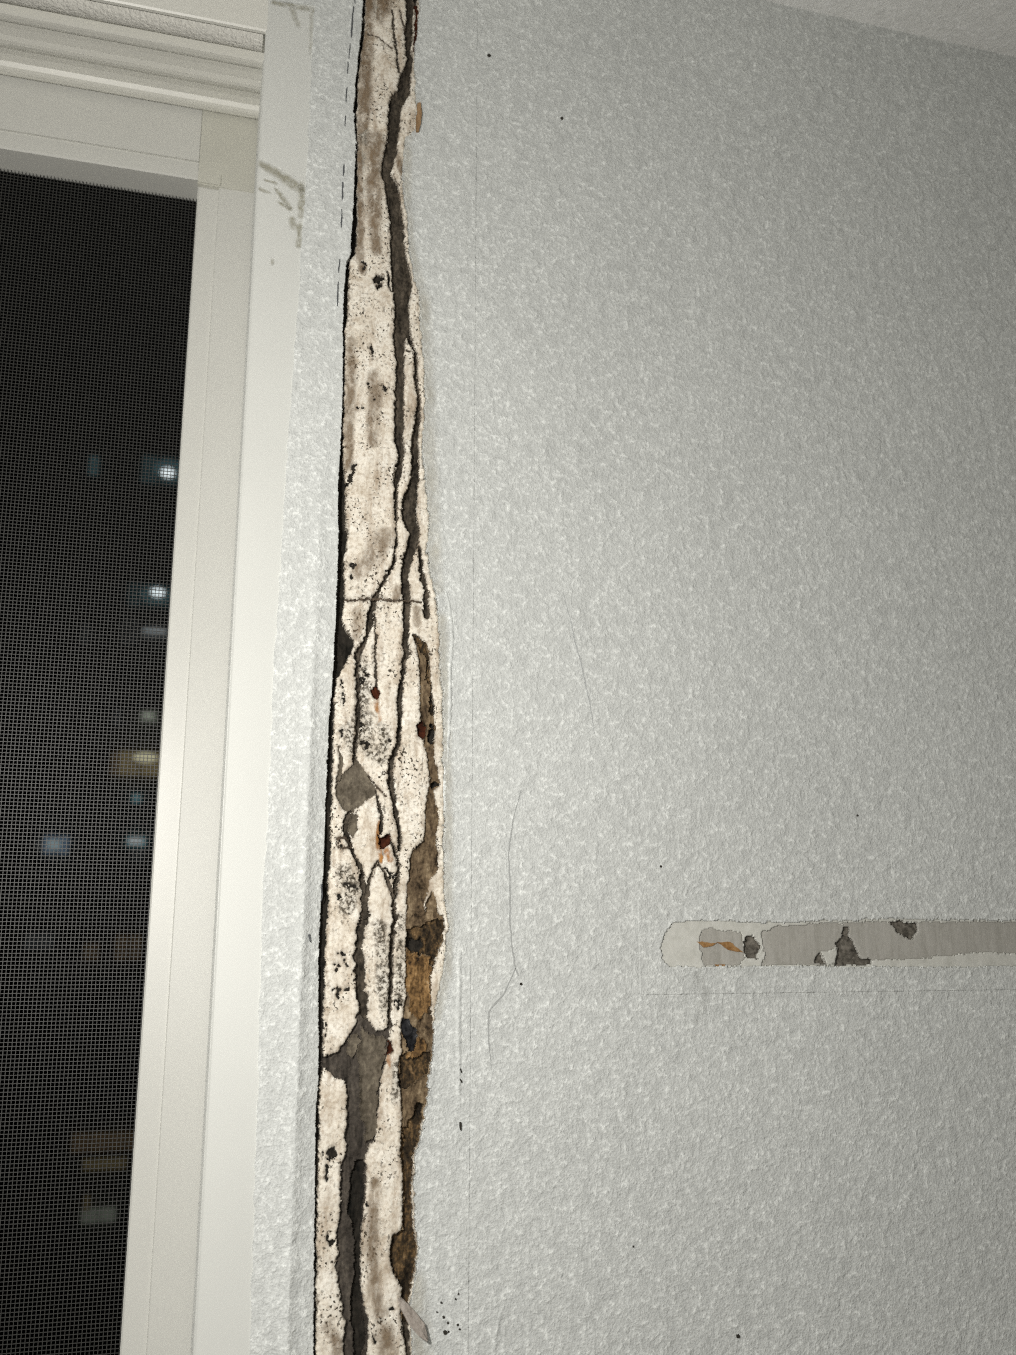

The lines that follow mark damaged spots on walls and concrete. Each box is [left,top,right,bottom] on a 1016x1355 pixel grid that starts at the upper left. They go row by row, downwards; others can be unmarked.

damp [357,0,390,273]
damp [345,342,355,470]
damp [356,534,389,569]
damp [345,656,388,762]
flaking render [315,0,449,1355]
damp [337,866,358,914]
damp [374,914,403,1008]
spalling [743,936,760,960]
spalling [814,927,871,966]
spalling [890,920,917,940]
damp [368,1206,392,1353]